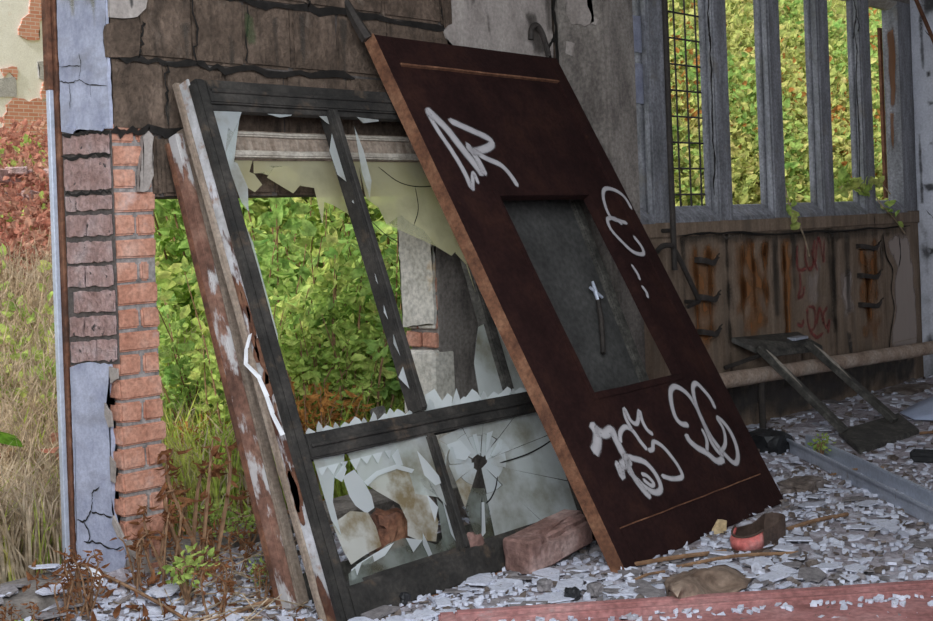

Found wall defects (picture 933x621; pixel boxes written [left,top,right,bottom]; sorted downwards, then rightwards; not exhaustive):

crack [58,0,444,161]
crack [65,189,111,197]
flaking render [136,131,154,192]
flaking render [56,0,150,574]
rust [692,245,714,343]
rust [740,240,769,334]
rust [782,239,791,333]
crack [77,487,123,550]